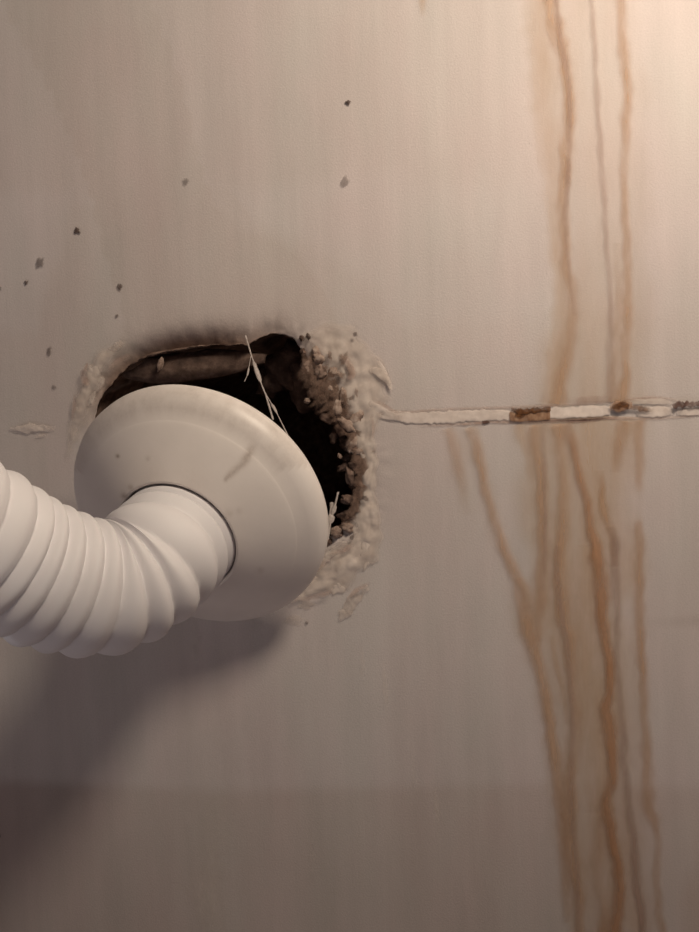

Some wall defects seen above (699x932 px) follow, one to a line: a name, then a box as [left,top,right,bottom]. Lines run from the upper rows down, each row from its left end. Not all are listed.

rust [557,28,573,127]
flaking render [122,332,395,620]
crack [383,399,699,425]
rust [576,458,644,932]